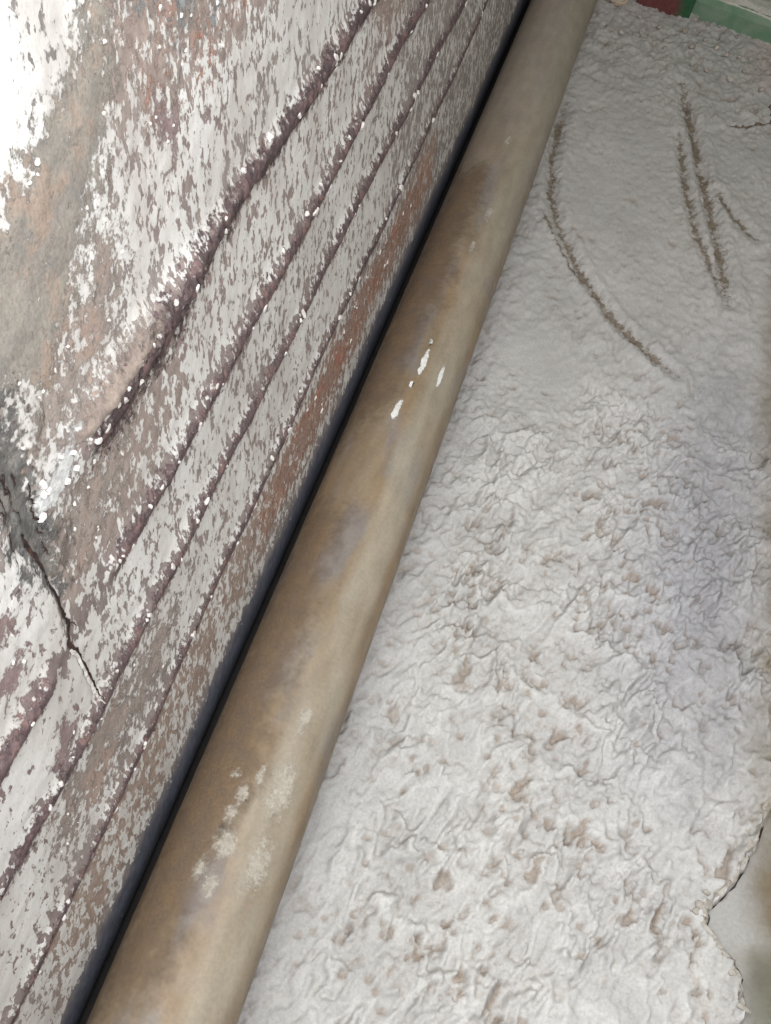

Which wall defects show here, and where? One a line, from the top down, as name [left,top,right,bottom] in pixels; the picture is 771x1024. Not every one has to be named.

efflorescence [33,402,88,523]
crack [21,534,106,704]
peeling [31,556,202,874]
peeling [0,0,259,717]
rust [0,0,488,1024]
peeling [248,165,423,550]